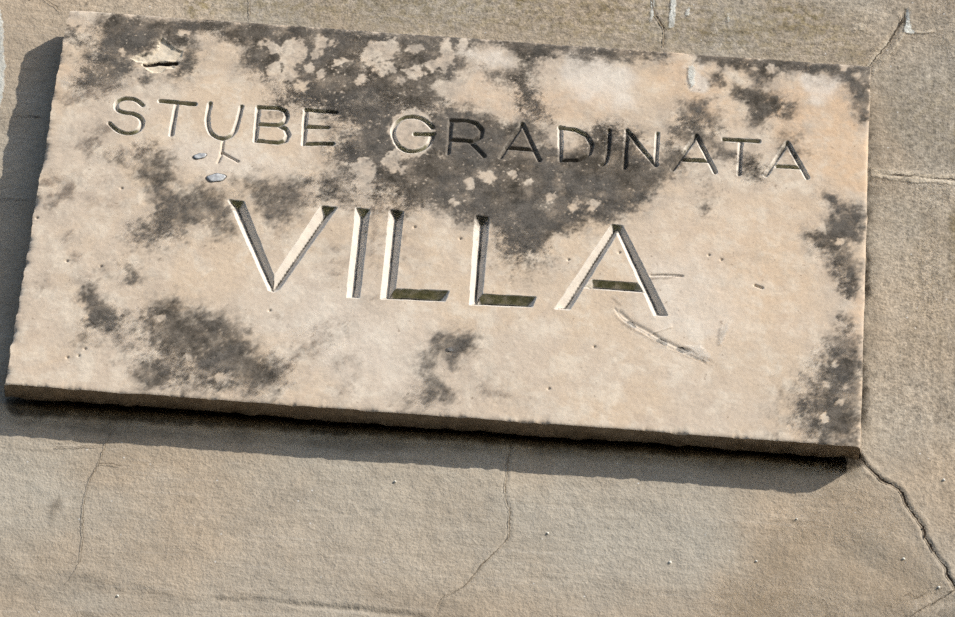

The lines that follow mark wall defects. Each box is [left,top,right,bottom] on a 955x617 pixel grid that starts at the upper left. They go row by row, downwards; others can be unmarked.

crack [868,11,905,67]
water stain [871,168,955,185]
crack [873,171,955,180]
water stain [7,399,864,469]
crack [57,432,122,579]
crack [436,440,512,614]
crack [860,457,955,617]